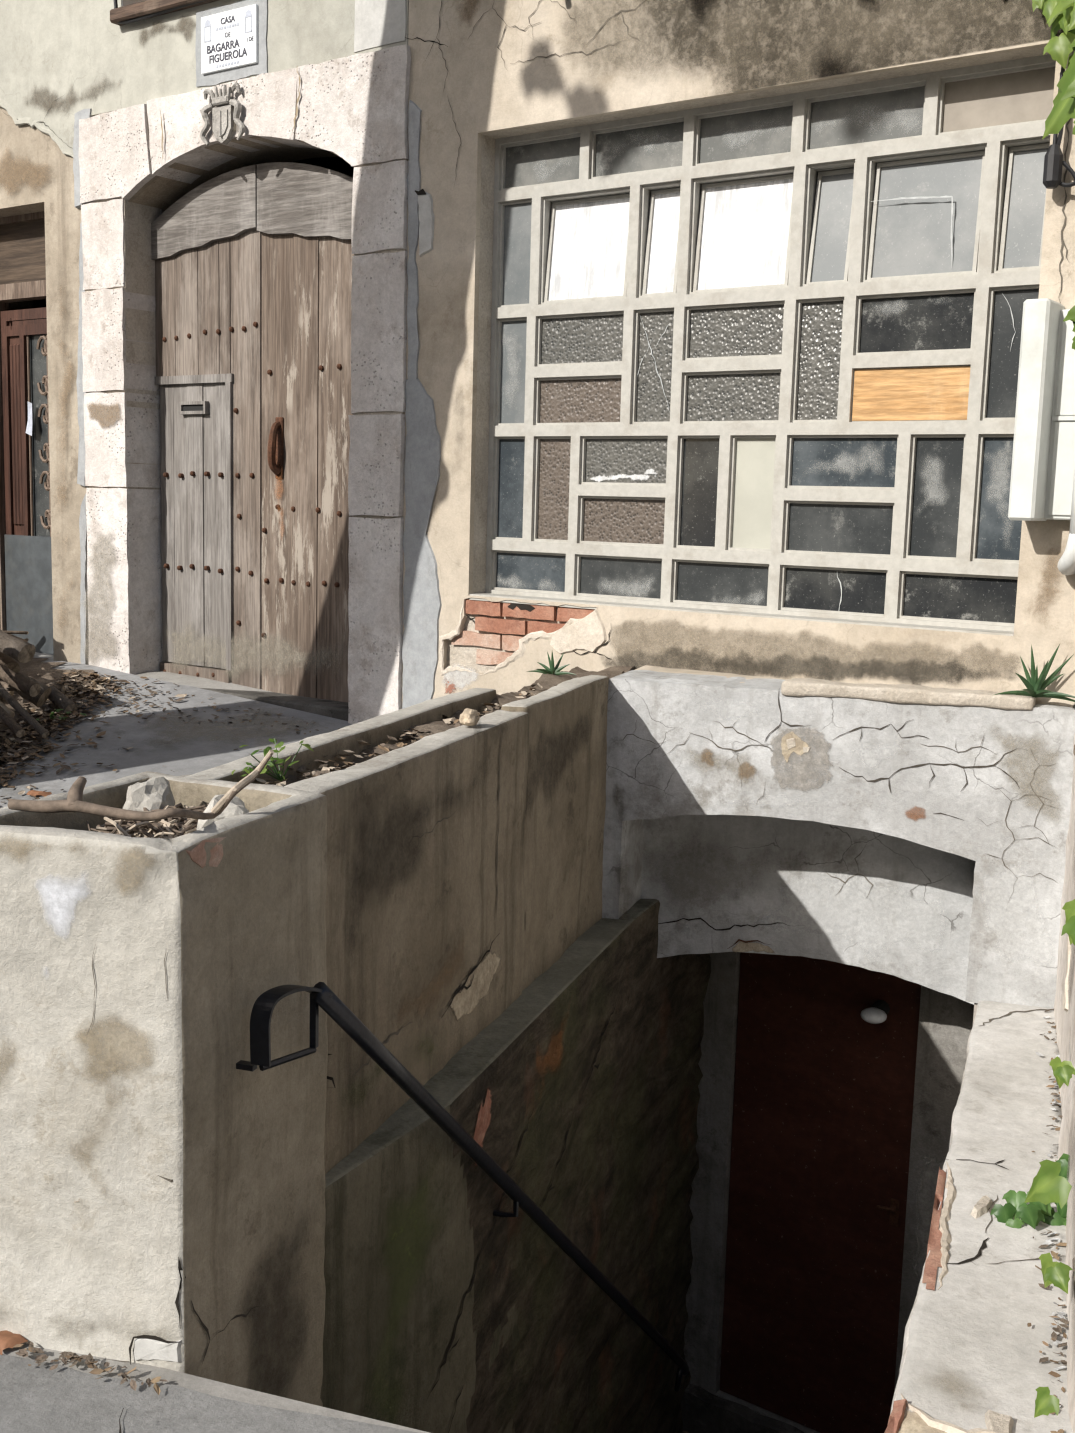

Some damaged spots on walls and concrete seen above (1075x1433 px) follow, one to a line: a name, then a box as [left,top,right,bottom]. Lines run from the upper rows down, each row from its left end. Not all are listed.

damp [574,0,1063,92]
peeling [0,98,74,158]
crack [405,0,645,190]
flaking render [439,599,607,676]
damp [608,622,1017,684]
spalling [771,728,832,791]
crack [614,693,1057,900]
flaking render [922,1161,957,1290]
crack [947,1159,1060,1265]
flaking render [884,1394,1014,1433]